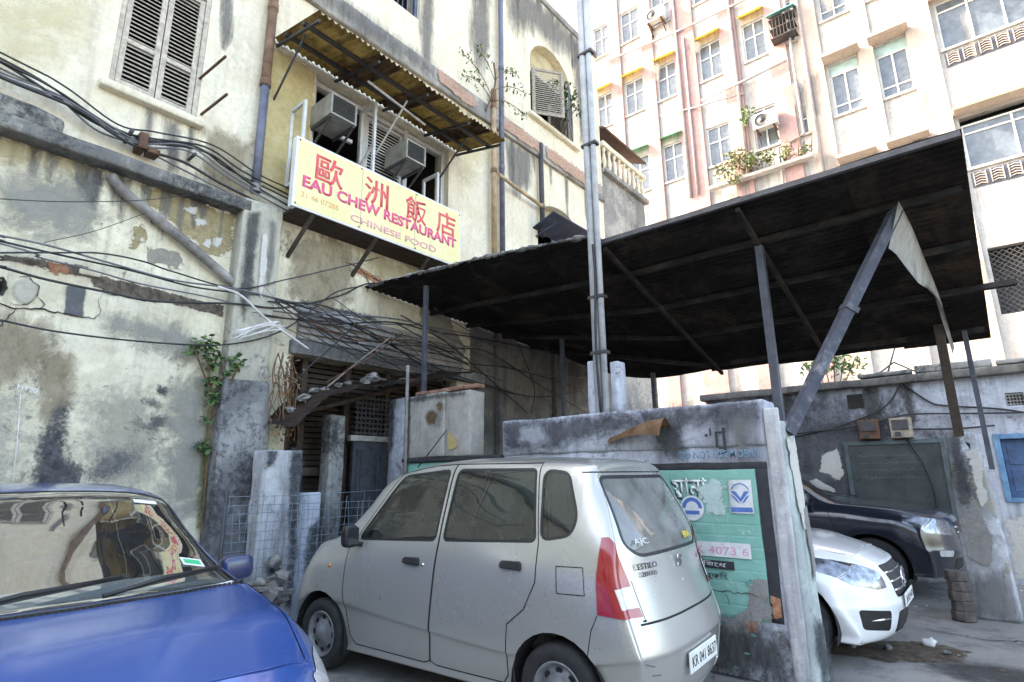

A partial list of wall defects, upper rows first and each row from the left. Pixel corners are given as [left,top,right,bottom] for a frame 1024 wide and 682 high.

damp [221,0,233,48]
flaking render [0,277,8,296]
flaking render [2,254,224,317]
peeling [129,225,184,270]
peeling [140,185,236,257]
damp [240,212,261,314]
damp [0,316,142,483]
damp [503,395,797,459]
peeling [819,448,844,480]
peeling [959,448,993,566]
flaking render [721,579,782,640]
damp [970,575,1020,623]